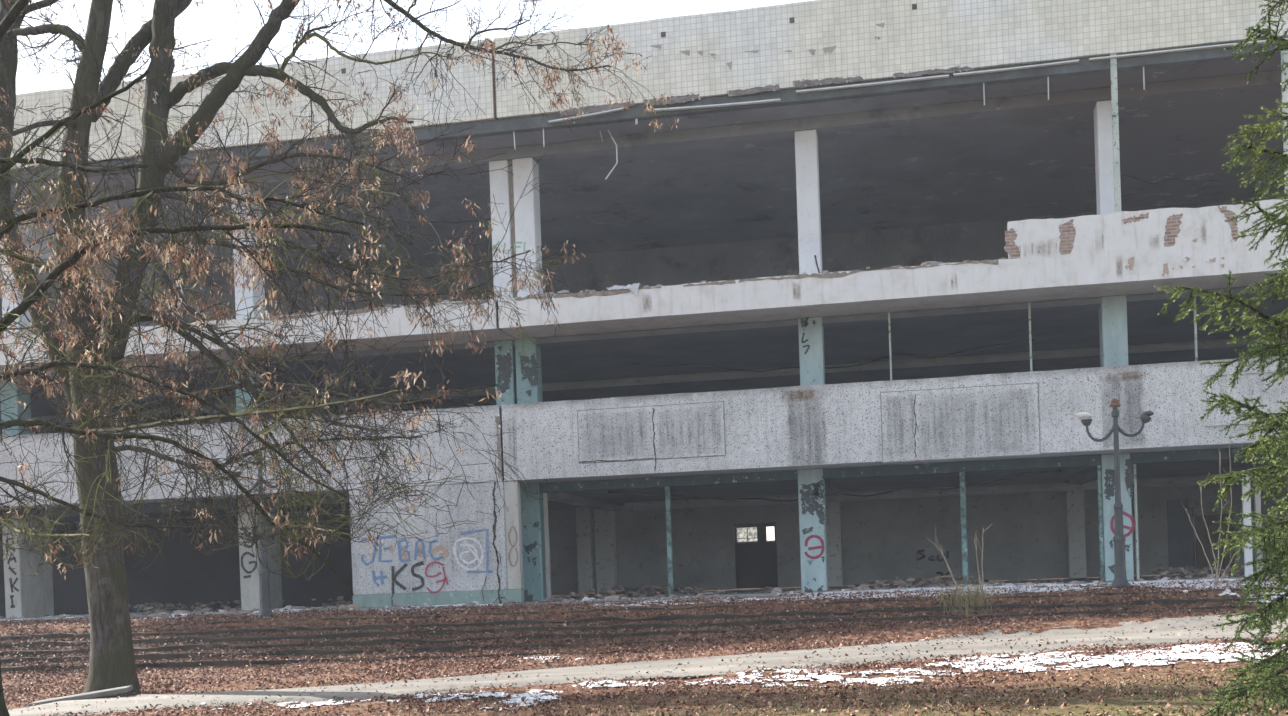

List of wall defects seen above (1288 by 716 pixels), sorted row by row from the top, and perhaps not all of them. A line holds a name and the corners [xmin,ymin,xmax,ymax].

spalling [1057,219,1076,255]
spalling [1122,212,1149,225]
spalling [1161,212,1224,276]
spalling [1216,204,1239,242]
peeling [495,346,539,397]
peeling [800,477,825,535]
crack [353,471,507,604]